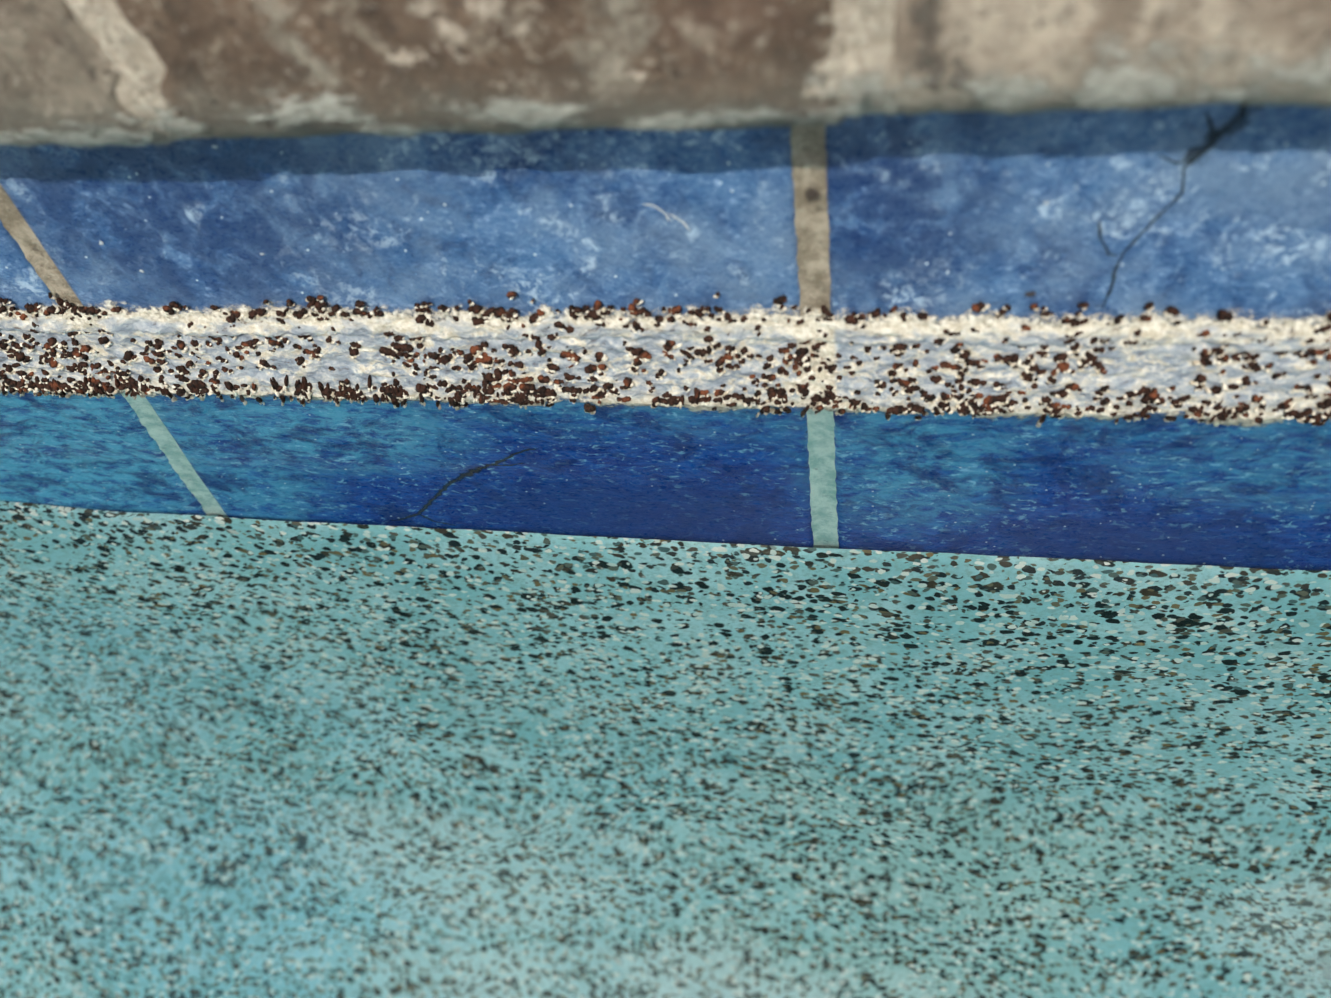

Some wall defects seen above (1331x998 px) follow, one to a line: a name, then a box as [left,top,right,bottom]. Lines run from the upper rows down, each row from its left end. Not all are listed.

crack [1098,104,1264,307]